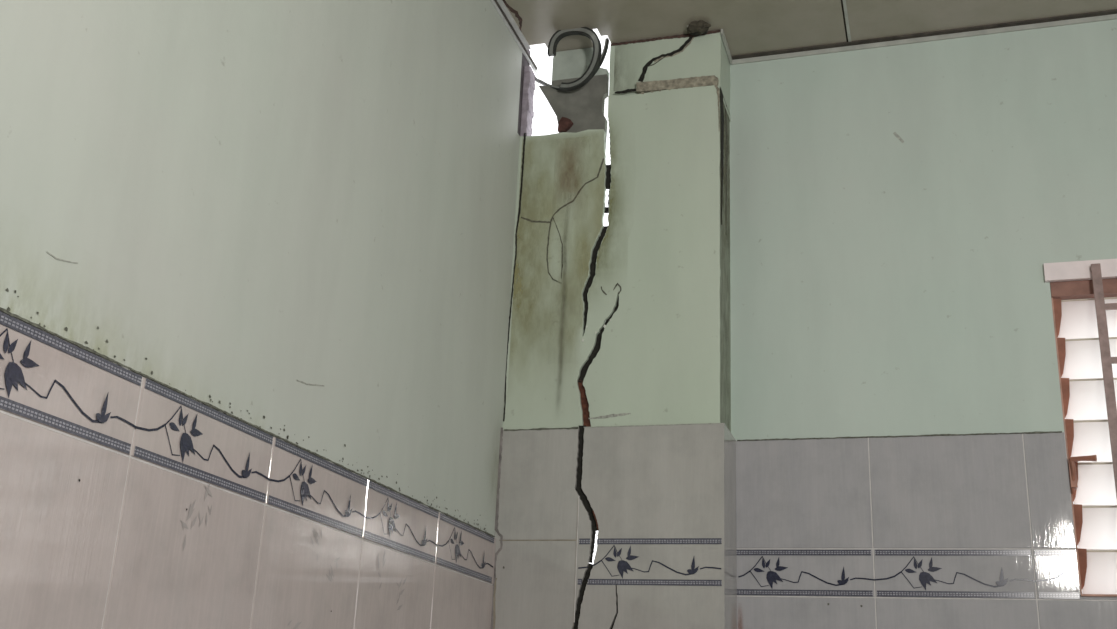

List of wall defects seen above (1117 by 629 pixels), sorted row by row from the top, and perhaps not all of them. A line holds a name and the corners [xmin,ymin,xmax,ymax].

crack [615,37,694,94]
water stain [581,177,615,273]
water stain [0,288,495,537]
crack [491,129,631,629]